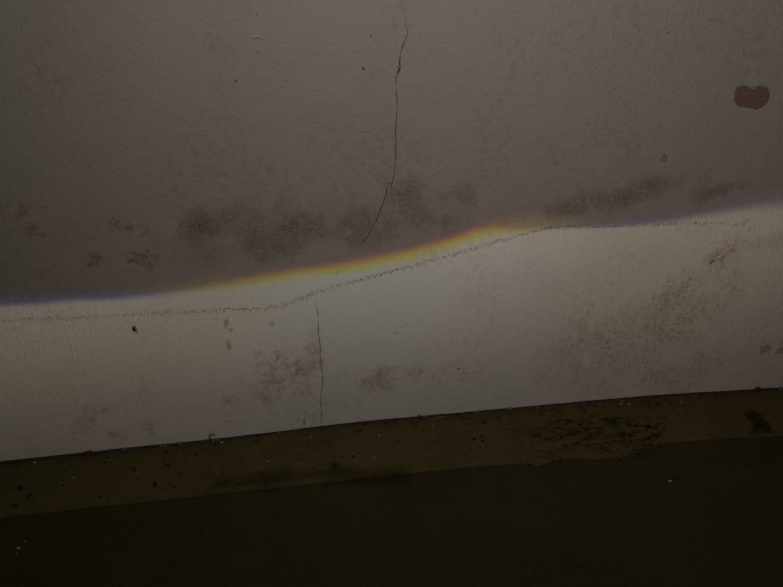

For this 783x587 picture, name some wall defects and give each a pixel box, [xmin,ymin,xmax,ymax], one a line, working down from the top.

crack [361,16,408,244]
spalling [734,84,771,110]
crack [303,303,323,425]